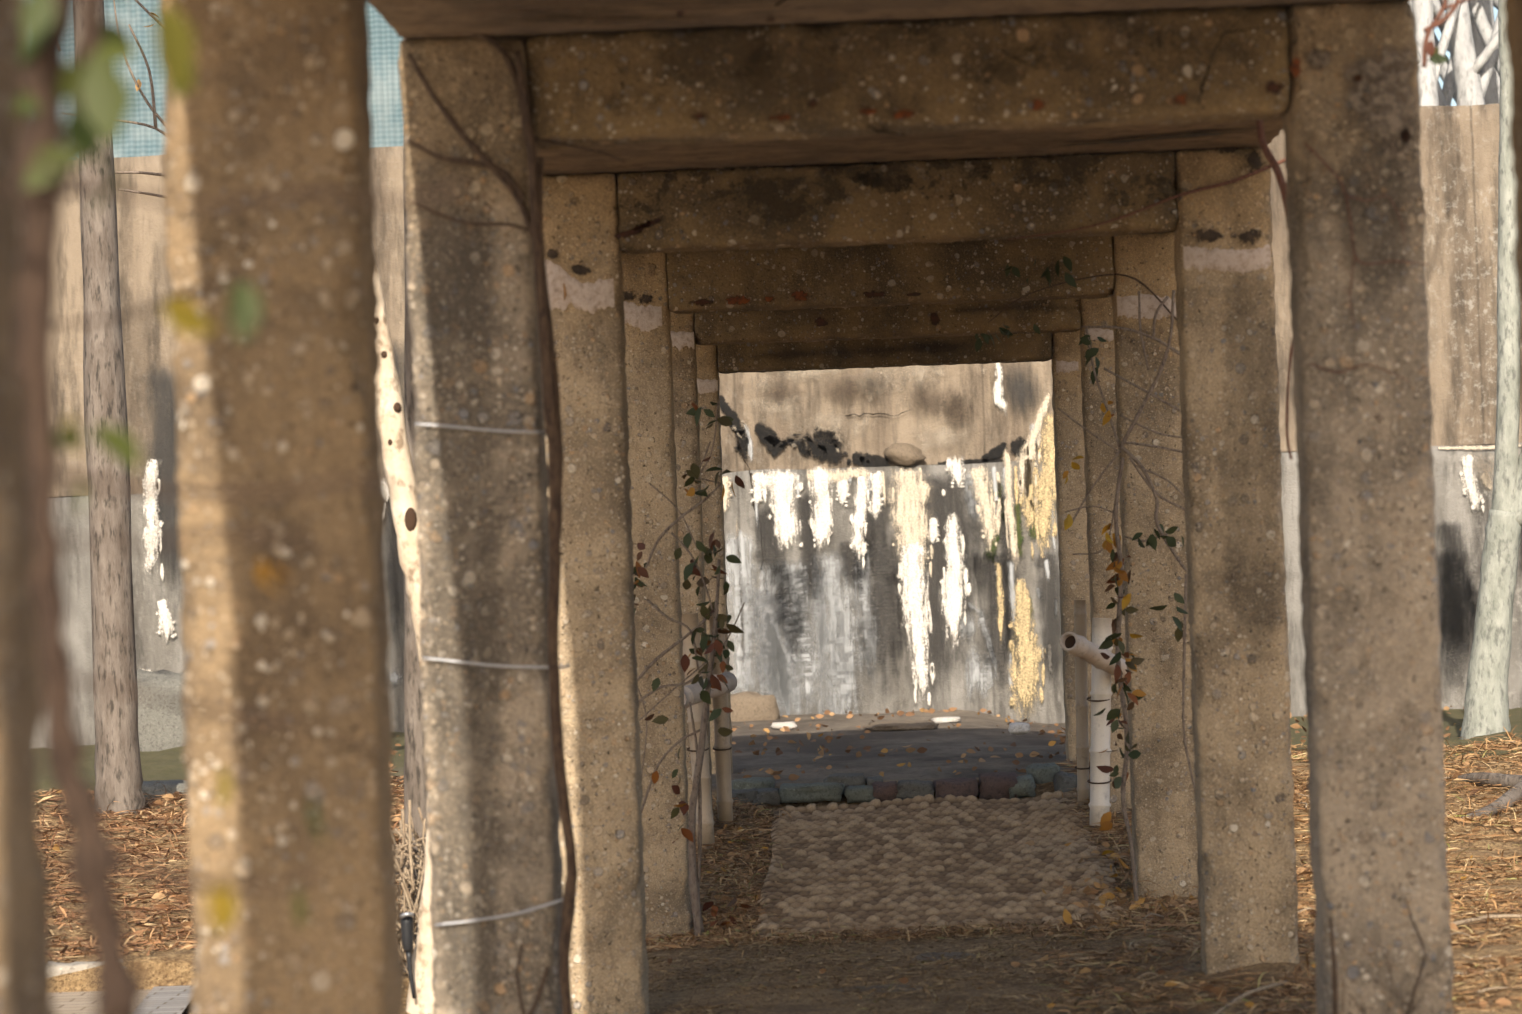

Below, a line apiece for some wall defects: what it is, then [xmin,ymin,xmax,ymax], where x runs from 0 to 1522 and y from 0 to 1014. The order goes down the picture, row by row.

leakage [614,131,1237,227]
leakage [722,344,1061,715]